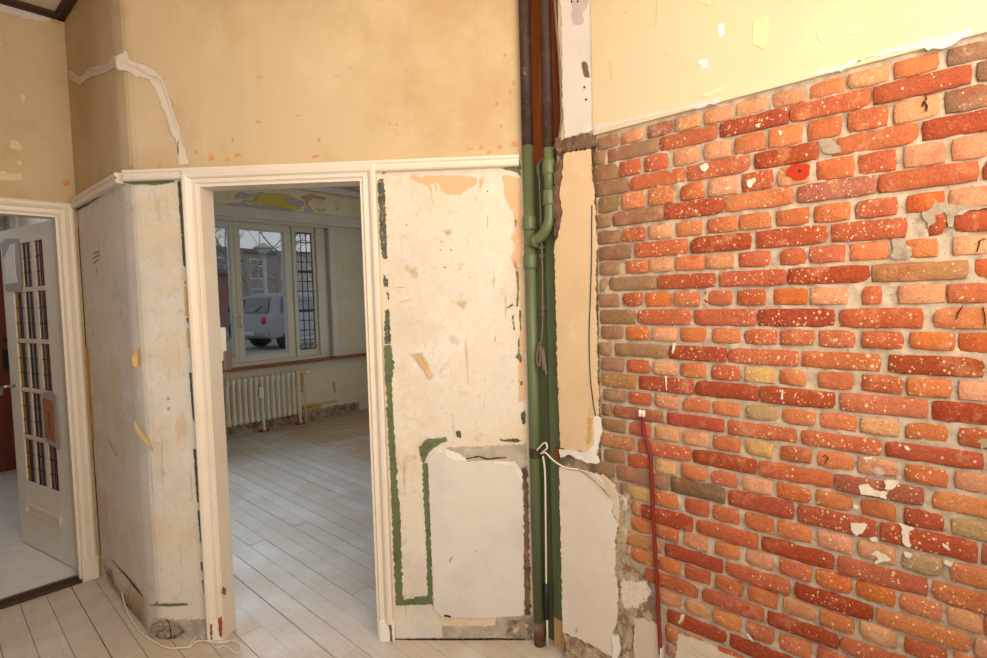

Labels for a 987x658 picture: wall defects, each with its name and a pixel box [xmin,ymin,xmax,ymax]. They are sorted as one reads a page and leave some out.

crack [68,51,189,165]
peeling [228,191,326,212]
peeling [410,175,484,207]
peeling [148,617,222,640]